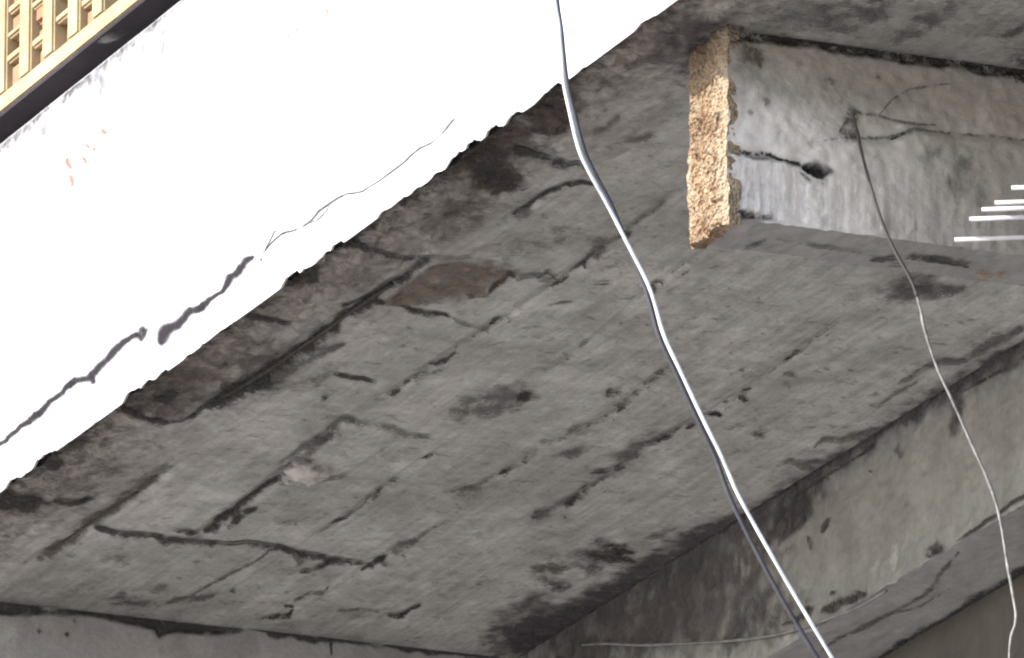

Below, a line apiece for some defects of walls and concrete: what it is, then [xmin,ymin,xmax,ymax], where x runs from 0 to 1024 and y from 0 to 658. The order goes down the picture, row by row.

crack [512,144,594,220]
crack [732,150,800,166]
crack [824,83,1024,141]
crack [0,118,471,446]
leakage [0,327,1024,658]
crack [94,520,451,620]